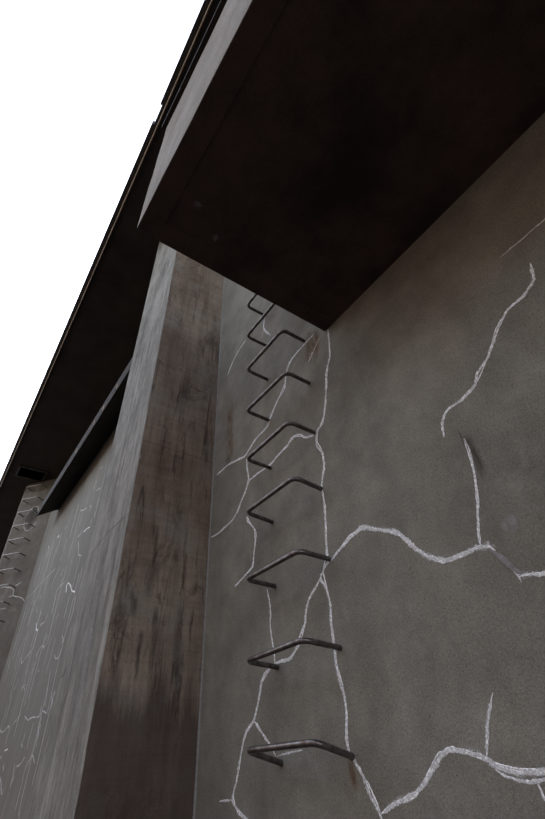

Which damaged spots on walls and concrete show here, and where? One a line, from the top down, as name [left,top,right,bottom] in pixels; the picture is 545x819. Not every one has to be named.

crack [502,218,545,256]
crack [0,466,126,816]
crack [212,263,545,819]